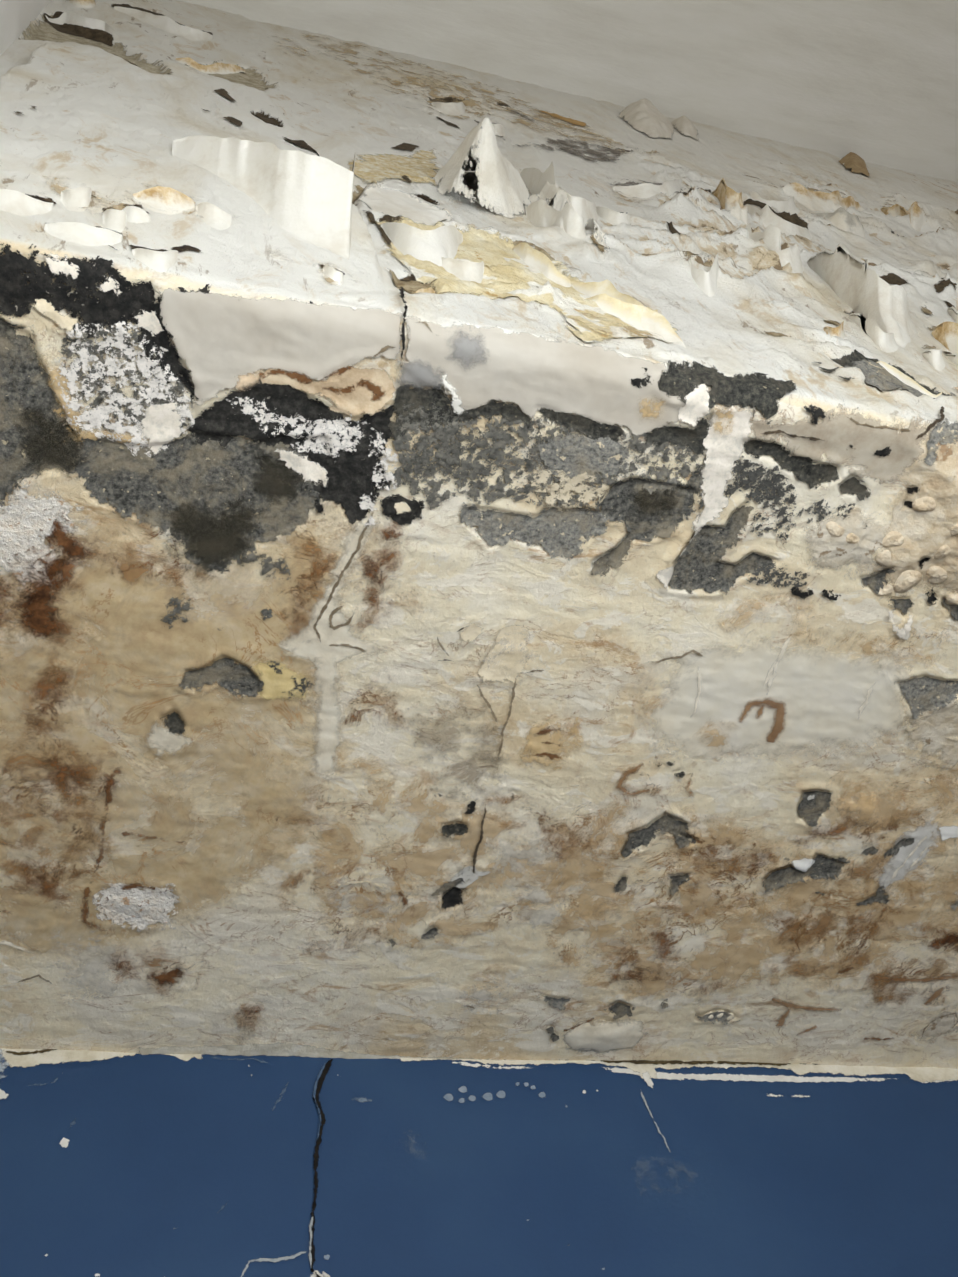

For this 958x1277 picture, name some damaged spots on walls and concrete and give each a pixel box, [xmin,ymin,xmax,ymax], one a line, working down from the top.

flaking render [18,0,278,101]
peeling [0,183,233,273]
peeling [172,110,484,294]
peeling [429,97,506,138]
peeling [596,175,958,399]
flaking render [839,152,870,176]
spalling [0,240,958,600]
corrosion [0,519,92,641]
leakage [0,243,958,1004]
spalling [861,567,958,640]
crack [241,1056,333,1277]